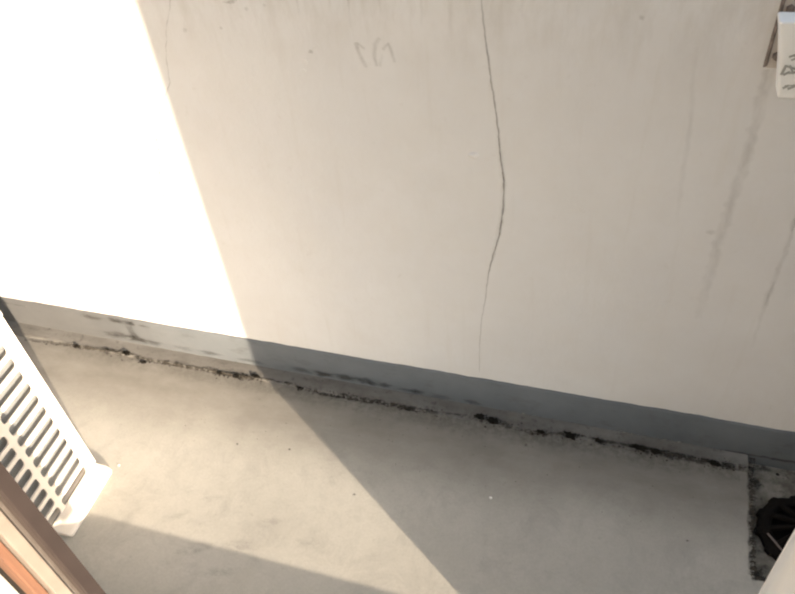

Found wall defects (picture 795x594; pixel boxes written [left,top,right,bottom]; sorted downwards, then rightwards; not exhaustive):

crack [492,149,505,256]
damp [746,454,769,582]